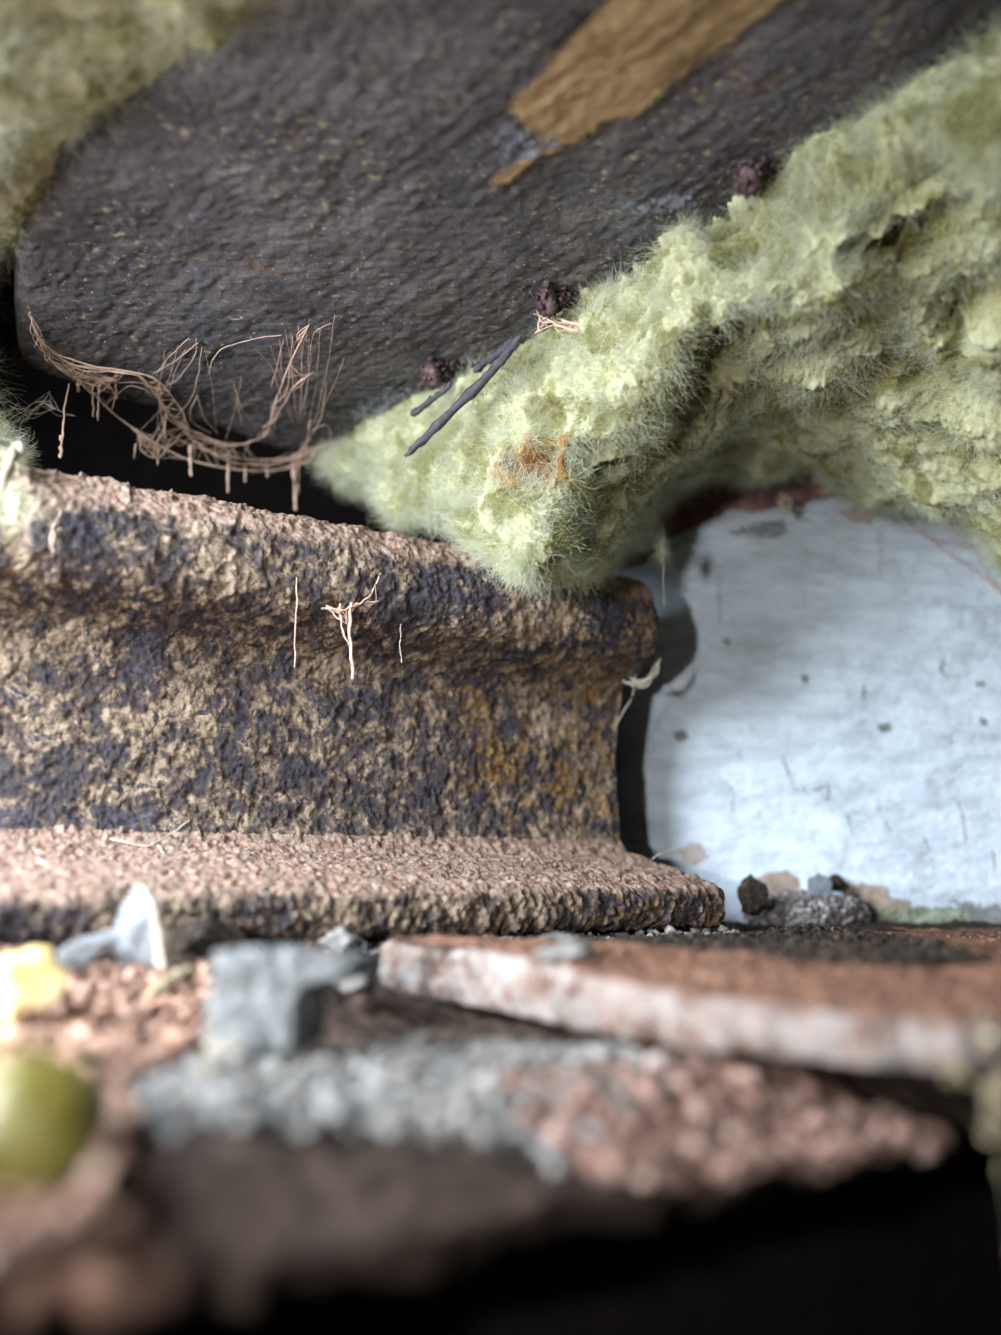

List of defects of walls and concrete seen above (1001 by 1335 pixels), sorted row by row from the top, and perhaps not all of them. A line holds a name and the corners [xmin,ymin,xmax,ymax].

rust [457,687,520,792]